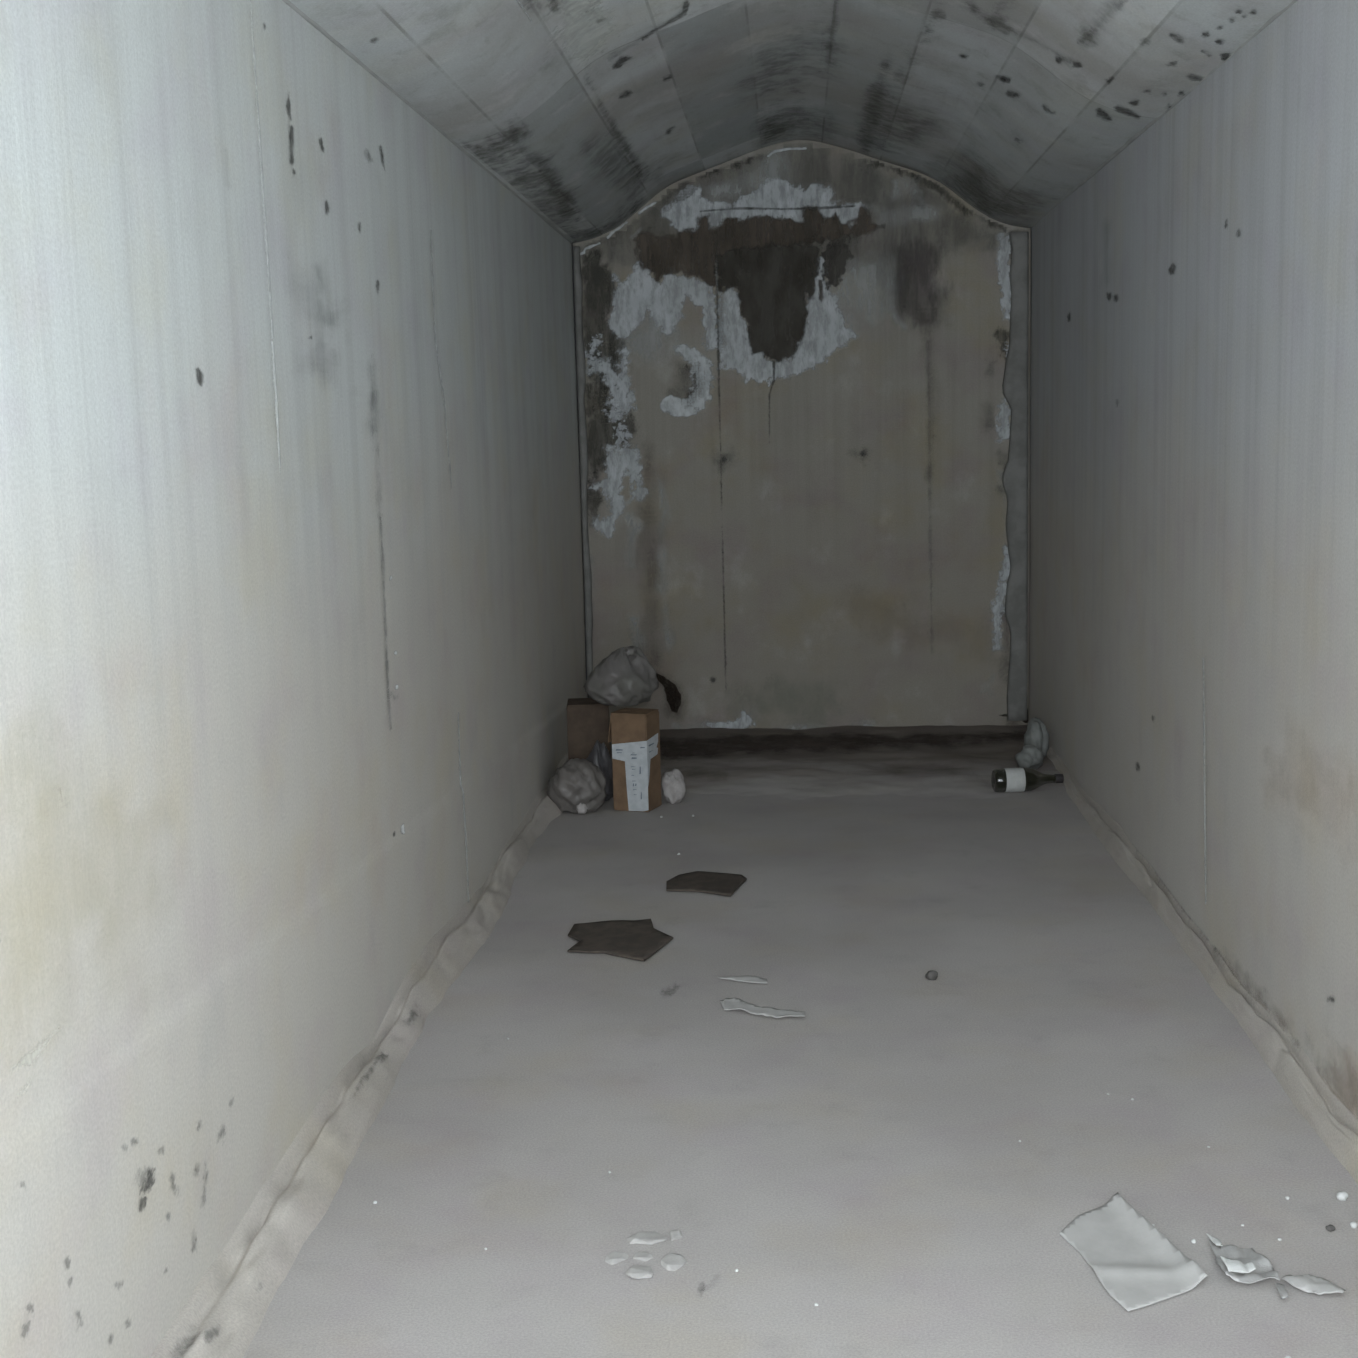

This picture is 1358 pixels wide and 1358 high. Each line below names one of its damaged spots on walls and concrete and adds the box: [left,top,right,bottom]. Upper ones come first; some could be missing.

damp [580,93,1012,538]
damp [992,546,1010,650]